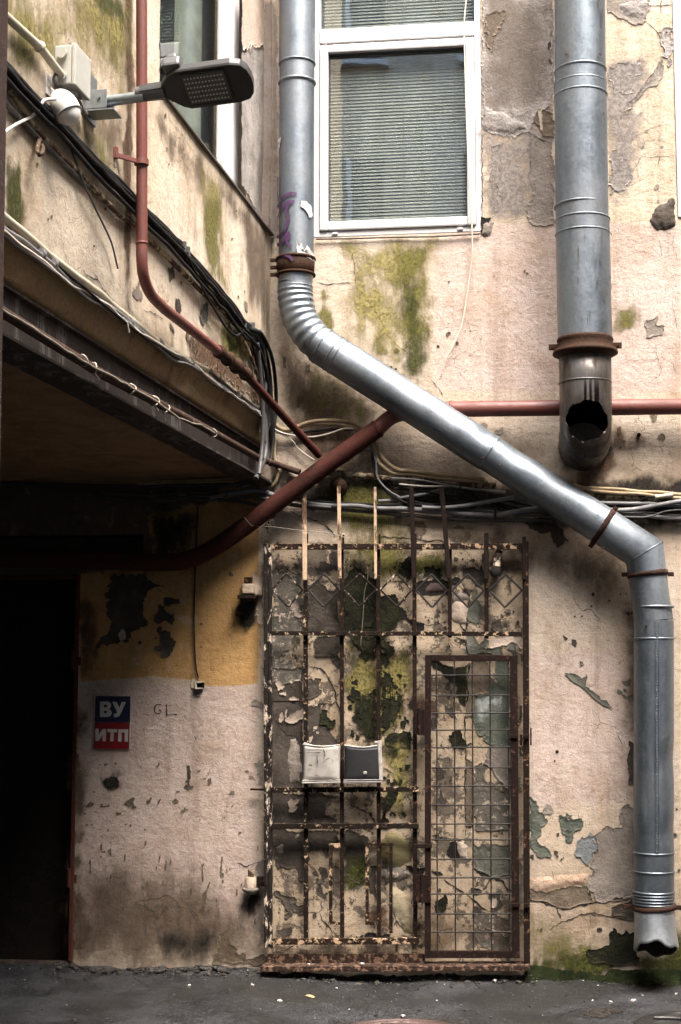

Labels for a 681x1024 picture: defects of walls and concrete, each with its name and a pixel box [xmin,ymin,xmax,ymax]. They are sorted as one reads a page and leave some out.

spalling [607,0,651,25]
damp [159,119,206,185]
spalling [480,0,555,236]
spalling [608,22,674,121]
damp [206,187,267,320]
damp [394,248,430,377]
peeling [644,315,665,338]
peeling [96,572,180,666]
peeling [417,553,634,921]
damp [74,843,256,960]